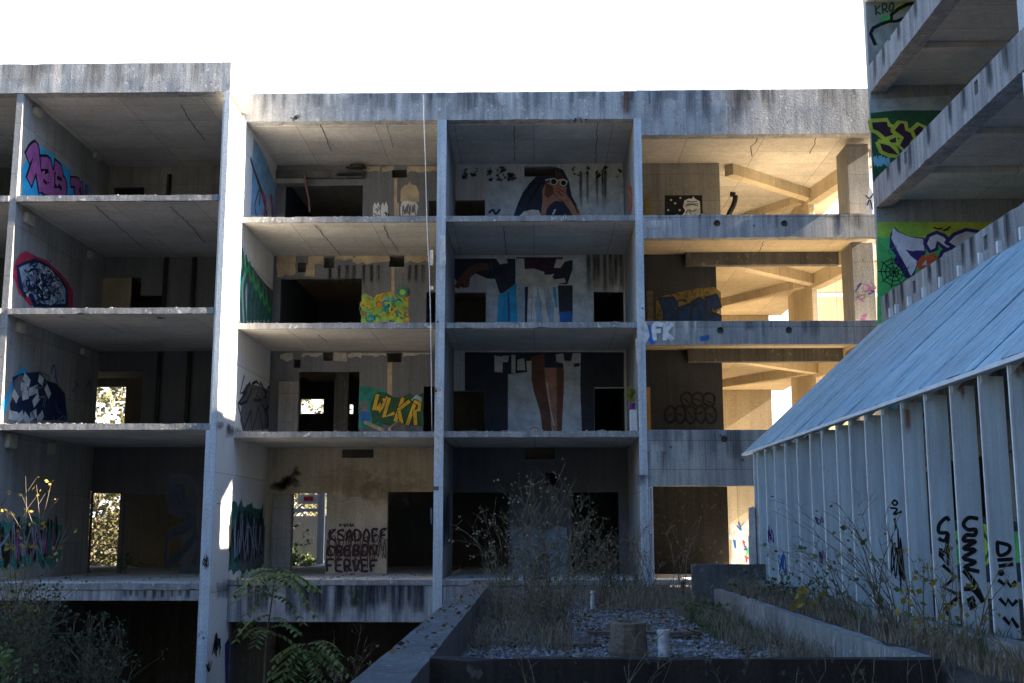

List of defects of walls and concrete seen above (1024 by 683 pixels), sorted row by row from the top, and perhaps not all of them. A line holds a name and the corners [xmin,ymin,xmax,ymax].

water stain [572,166,622,201]
flaking render [276,235,446,294]
water stain [587,255,623,287]
flaking render [280,352,431,396]
water stain [286,586,423,611]